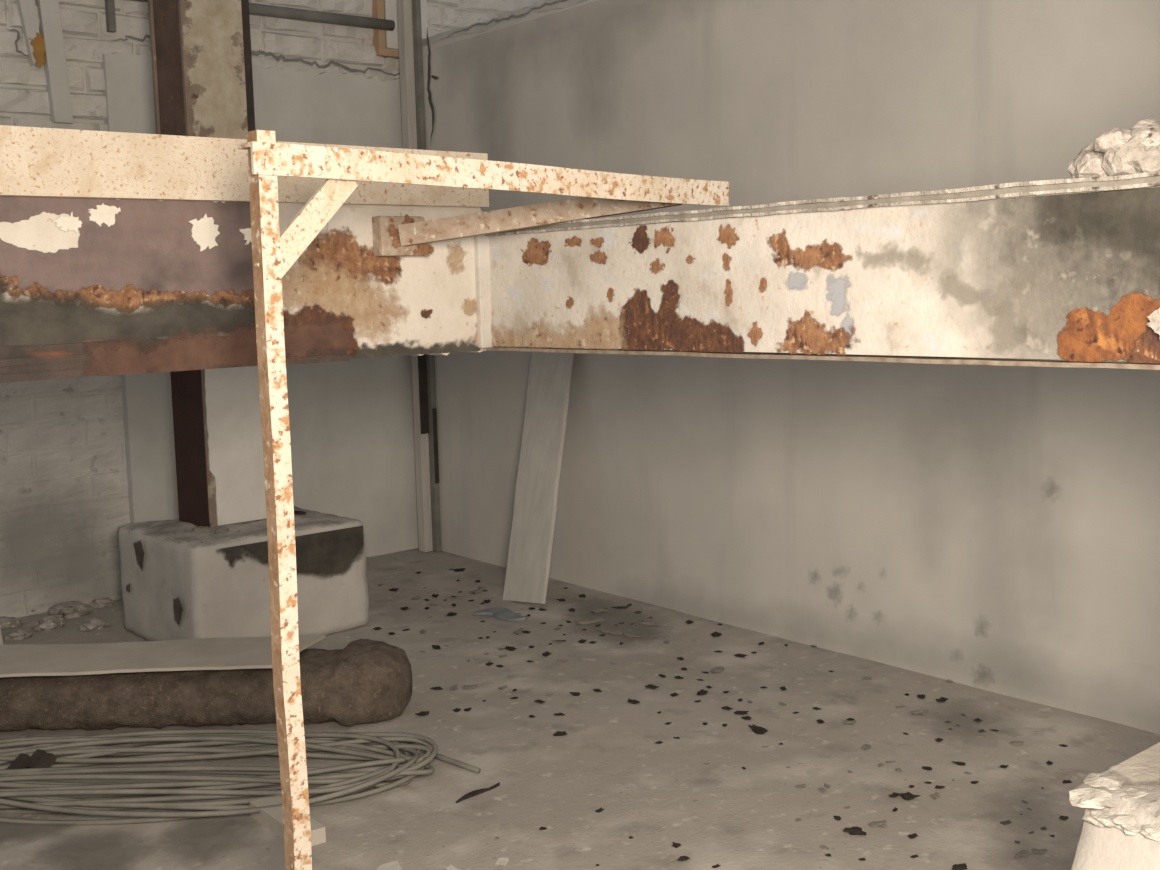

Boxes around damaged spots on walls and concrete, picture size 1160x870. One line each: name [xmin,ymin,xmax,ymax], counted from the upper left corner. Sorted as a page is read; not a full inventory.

peeling [0,196,254,296]
rust [0,276,255,312]
rust [88,326,258,376]
rust [282,214,414,361]
rust [464,224,763,353]
rust [768,231,851,271]
rust [777,311,858,355]
water stain [859,250,923,269]
water stain [944,276,1016,349]
rust [1057,293,1160,364]
peeling [1147,308,1160,339]
spalling [1069,742,1160,841]